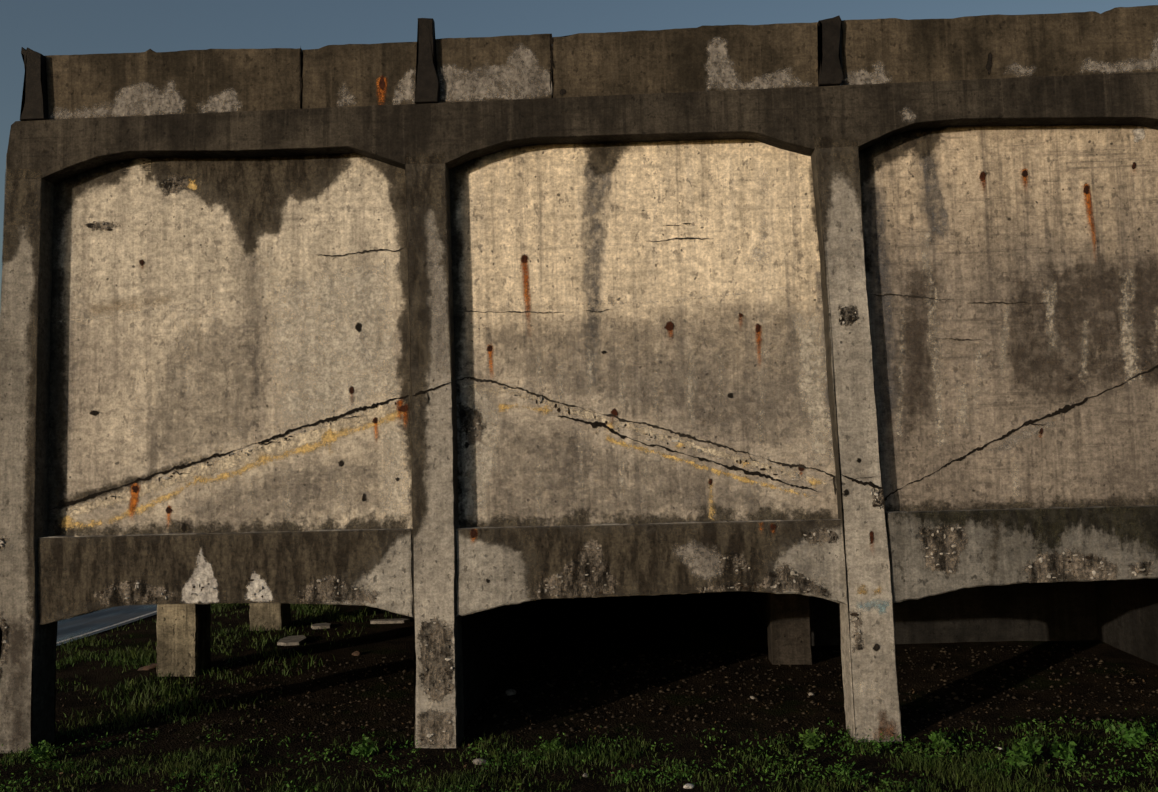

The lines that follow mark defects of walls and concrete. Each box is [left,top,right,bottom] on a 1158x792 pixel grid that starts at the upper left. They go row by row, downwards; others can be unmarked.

leakage [438,46,552,101]
rust [1083,184,1094,236]
rust [521,255,530,311]
leakage [810,111,947,441]
crack [870,293,1041,304]
leakage [1011,264,1158,398]
leakage [2,142,842,752]
crack [49,365,1158,518]
rust [129,484,139,512]
peeling [92,549,219,605]
spalling [533,538,618,599]
spalling [415,616,455,748]